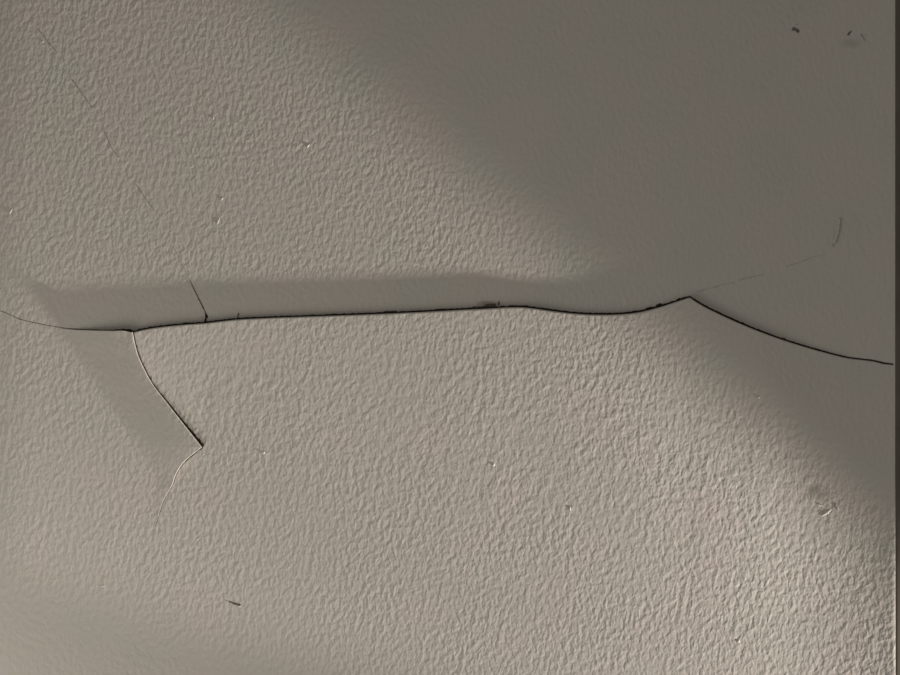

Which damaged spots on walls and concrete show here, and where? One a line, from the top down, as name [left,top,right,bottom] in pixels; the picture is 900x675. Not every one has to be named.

crack [1,250,893,527]